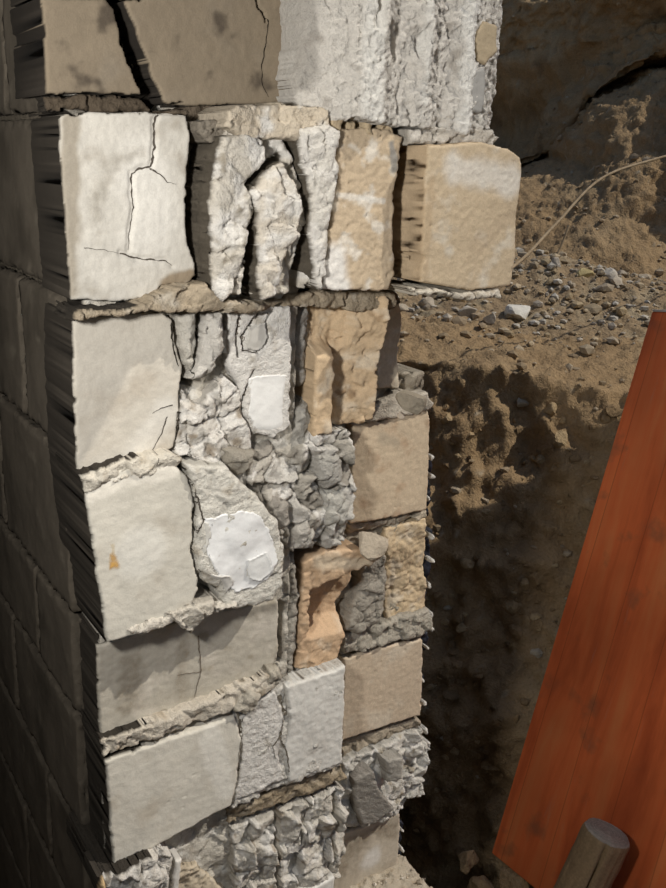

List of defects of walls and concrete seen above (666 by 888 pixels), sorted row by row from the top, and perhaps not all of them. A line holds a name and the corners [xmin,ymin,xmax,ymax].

crack [85,0,171,265]
crack [255,0,269,92]
spalling [169,0,503,593]
crack [180,636,201,698]